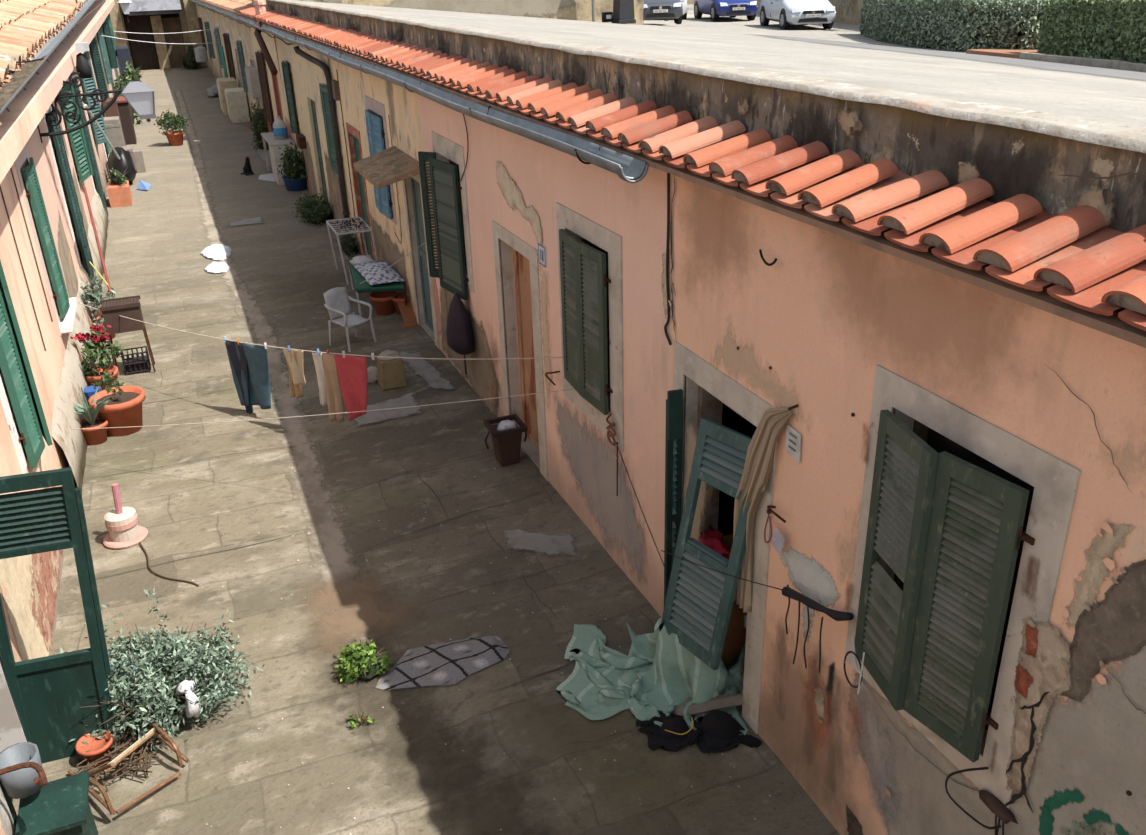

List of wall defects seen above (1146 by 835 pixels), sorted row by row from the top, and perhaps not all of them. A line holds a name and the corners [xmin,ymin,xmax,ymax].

peeling [495,161,543,245]
crack [1044,364,1134,494]
peeling [780,547,840,642]
peeling [846,521,1146,835]
crack [1107,670,1146,714]